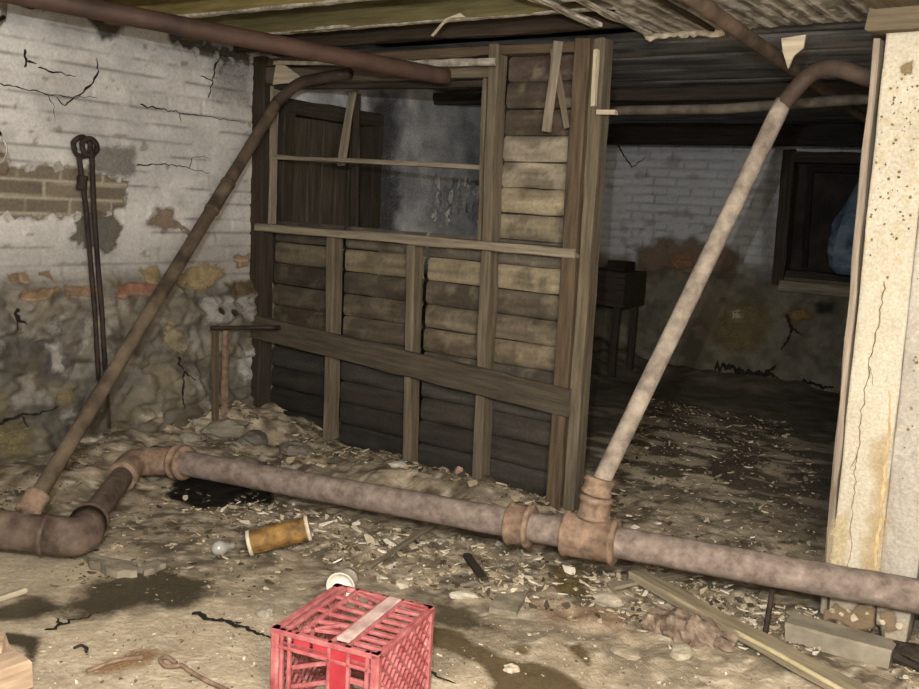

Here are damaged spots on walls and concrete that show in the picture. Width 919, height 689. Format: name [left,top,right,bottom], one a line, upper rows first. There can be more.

crack [0,49,99,121]
crack [140,52,246,123]
peeling [0,148,135,254]
flaking render [8,271,97,302]
crack [847,281,886,567]
rust [865,391,892,571]
water stain [5,633,39,662]
water stain [0,568,211,621]
crack [192,611,271,638]